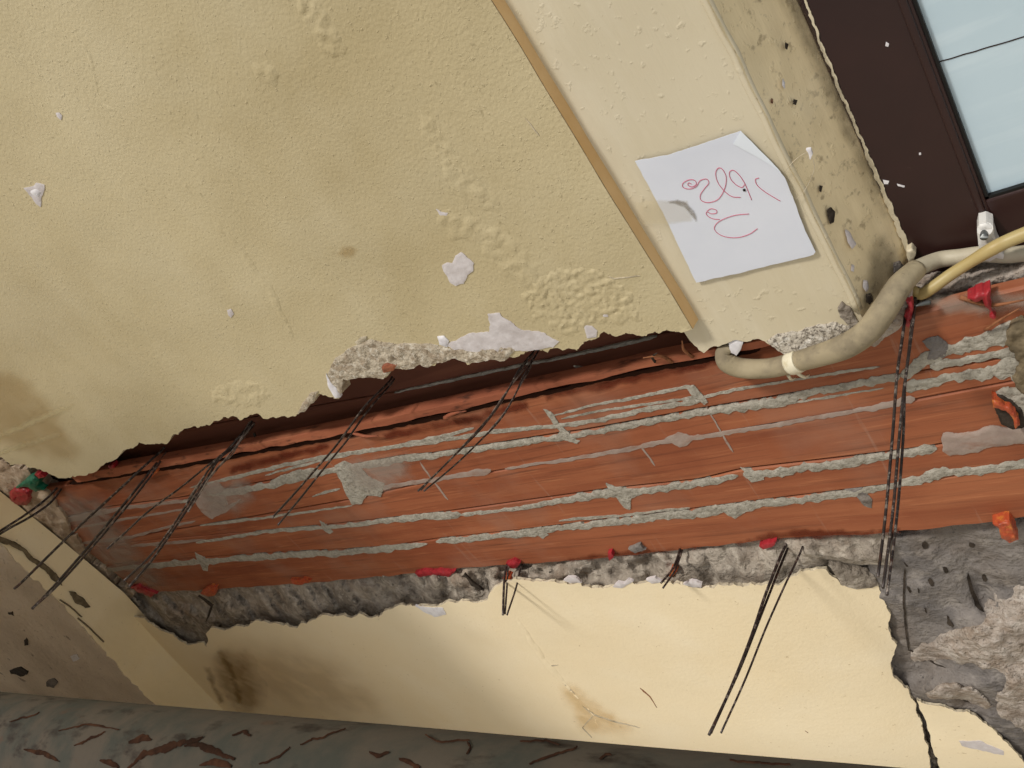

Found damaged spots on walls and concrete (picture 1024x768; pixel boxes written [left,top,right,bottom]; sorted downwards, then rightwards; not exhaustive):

peeling [24,183,45,207]
peeling [442,252,474,286]
spalling [297,313,559,414]
peeling [584,325,597,338]
peeling [728,340,743,356]
spalling [995,315,1024,430]
rust [231,445,327,472]
spalling [0,457,1024,768]